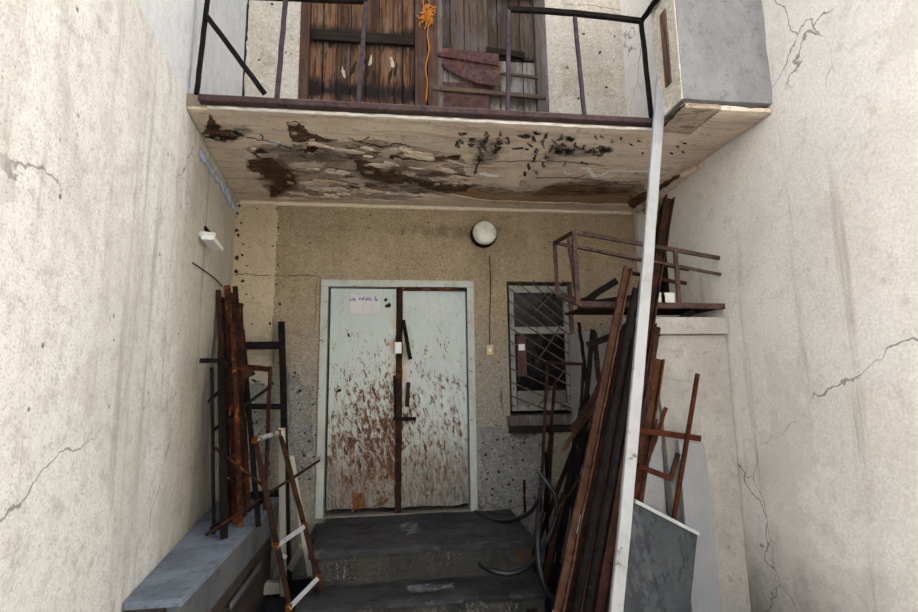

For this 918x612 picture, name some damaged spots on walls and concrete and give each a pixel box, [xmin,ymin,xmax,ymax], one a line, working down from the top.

water stain [257,150,356,195]
water stain [360,131,649,204]
peeling [200,115,472,338]
flaking render [246,349,316,482]
flaking render [479,423,548,512]